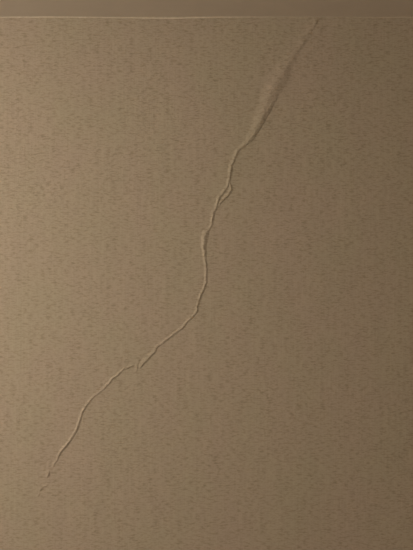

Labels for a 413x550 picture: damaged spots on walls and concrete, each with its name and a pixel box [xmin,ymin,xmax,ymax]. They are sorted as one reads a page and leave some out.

crack [35,136,256,498]